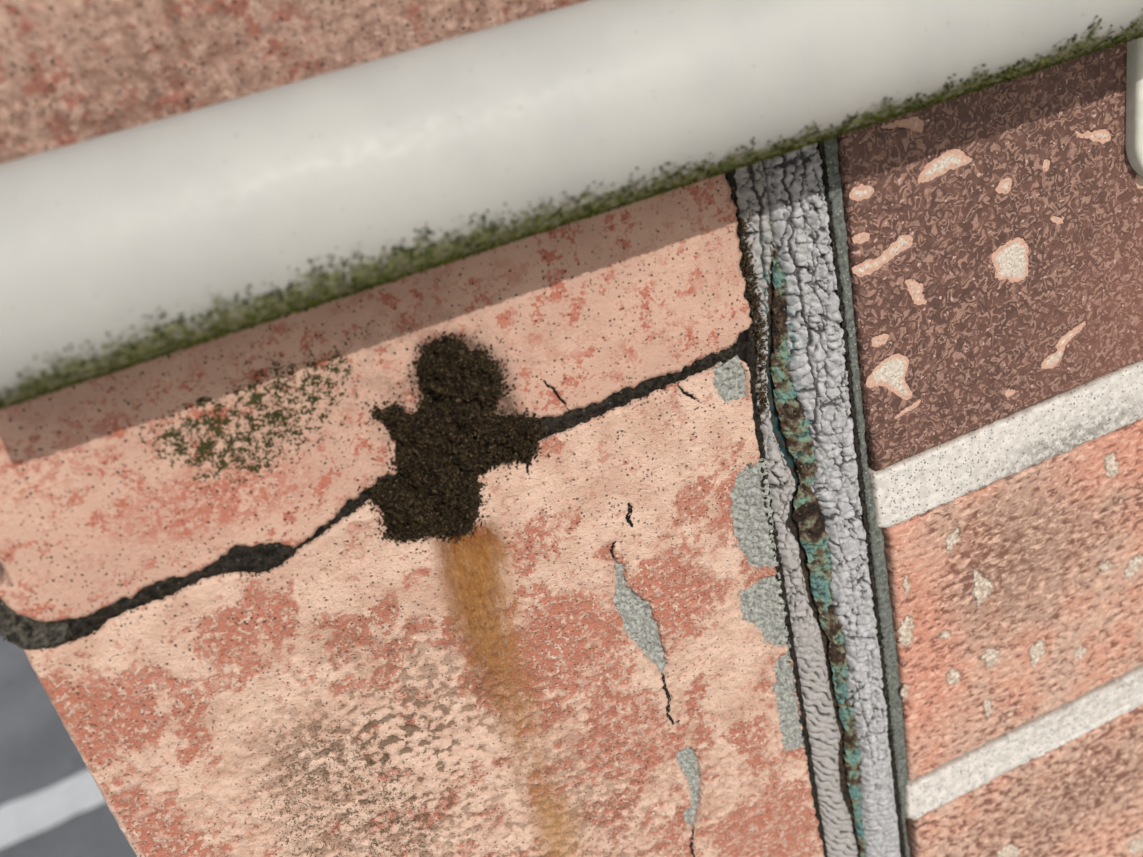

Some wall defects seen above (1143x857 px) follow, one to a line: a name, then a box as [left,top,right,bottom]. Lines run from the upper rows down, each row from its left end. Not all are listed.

spalling [713,356,746,403]
crack [0,473,404,652]
rust [440,527,521,706]
crack [526,221,867,857]
spalling [729,458,805,752]